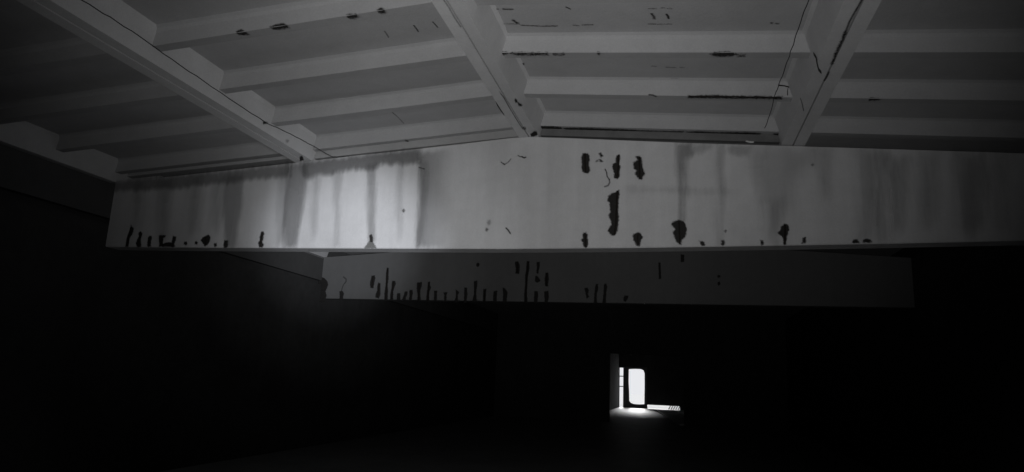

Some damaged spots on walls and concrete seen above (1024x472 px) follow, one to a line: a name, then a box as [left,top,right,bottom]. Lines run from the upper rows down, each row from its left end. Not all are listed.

crack [813,0,862,81]
spalling [688,85,789,99]
water stain [303,151,418,176]
spalling [633,156,645,180]
spalling [581,153,620,235]
spalling [125,226,228,248]
spalling [671,220,687,262]
spalling [778,224,789,245]
spalling [370,268,507,303]
spalling [515,261,549,303]